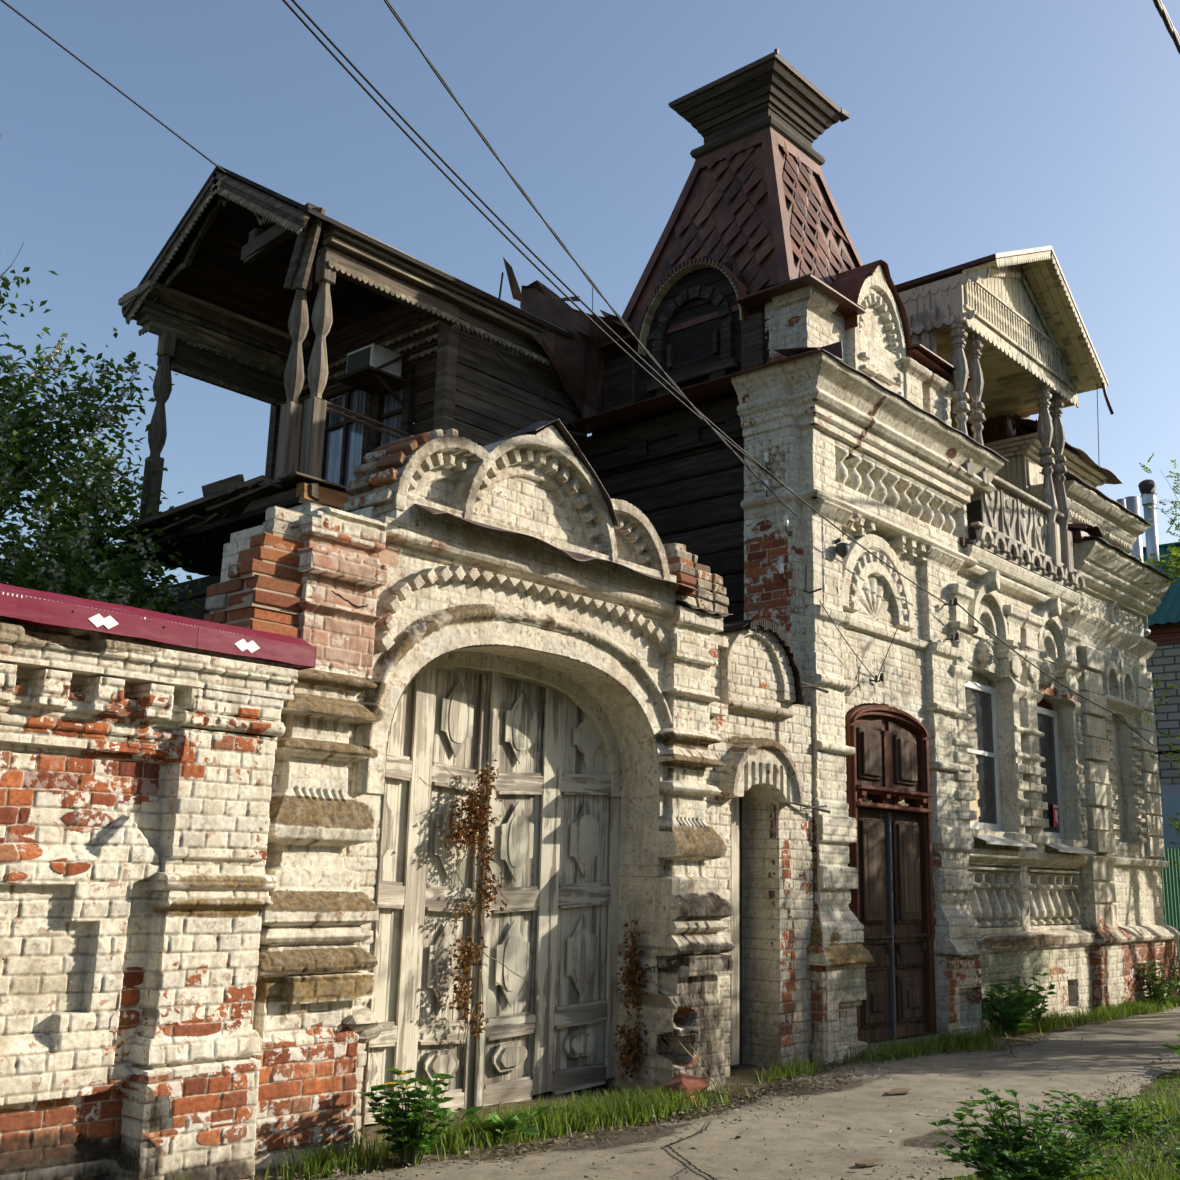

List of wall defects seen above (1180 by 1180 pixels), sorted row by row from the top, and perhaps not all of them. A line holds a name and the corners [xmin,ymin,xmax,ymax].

peeling [264,522,407,675]
peeling [744,520,804,633]
peeling [112,690,132,708]
peeling [227,717,269,729]
peeling [0,712,209,886]
peeling [779,839,819,1051]
peeling [1089,918,1179,1013]
peeling [0,1020,358,1162]